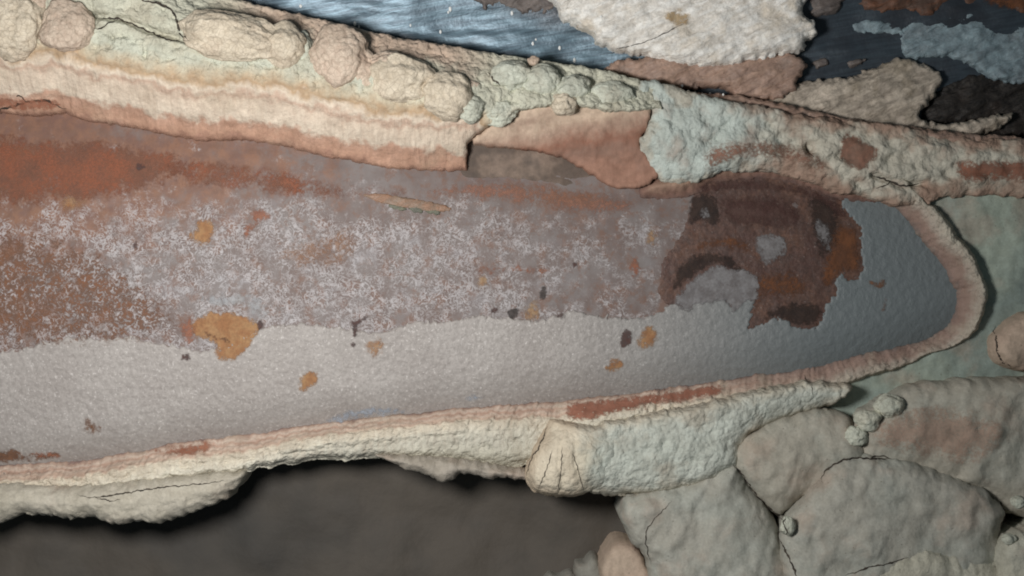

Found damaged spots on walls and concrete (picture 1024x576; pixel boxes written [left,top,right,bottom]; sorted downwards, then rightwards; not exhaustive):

rust [171,163,340,195]
spalling [461,141,595,186]
rust [0,236,259,360]
leakage [0,186,988,497]
rust [300,372,317,391]
rust [566,385,721,420]
crack [526,429,546,476]
crack [821,455,891,478]
crack [73,480,223,502]